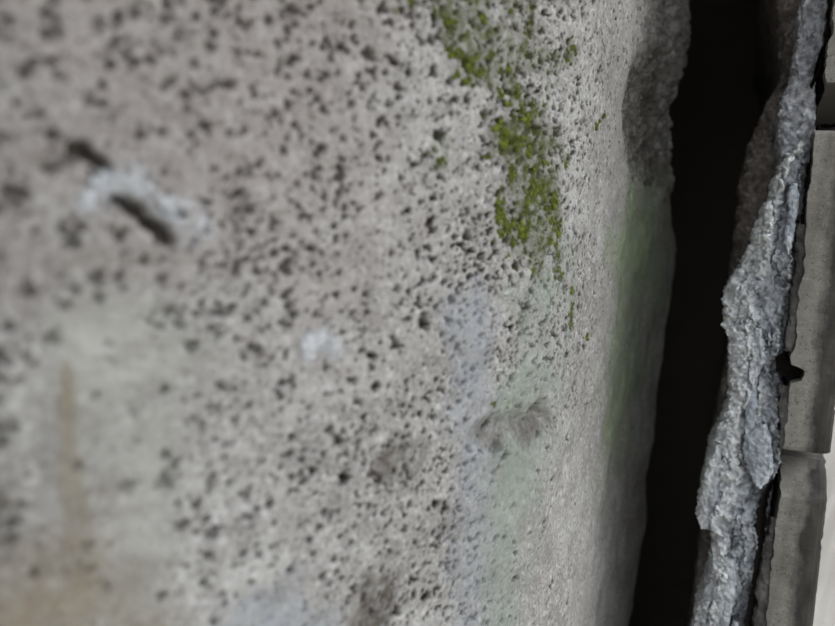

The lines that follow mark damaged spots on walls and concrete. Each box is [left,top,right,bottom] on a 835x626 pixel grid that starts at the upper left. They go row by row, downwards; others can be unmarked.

spalling [688,141,808,626]
crack [744,473,776,626]